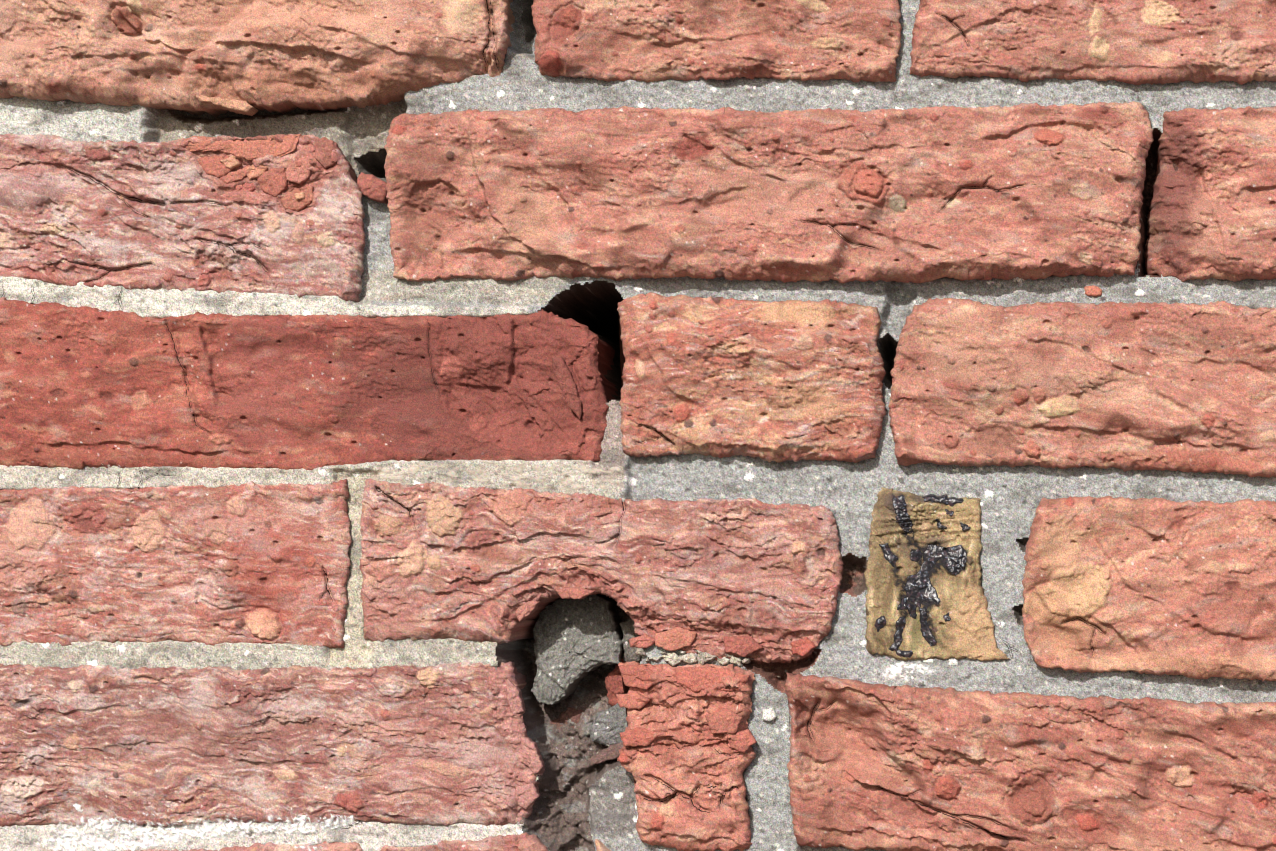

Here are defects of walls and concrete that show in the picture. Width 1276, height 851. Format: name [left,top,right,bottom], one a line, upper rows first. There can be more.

crack [164,319,207,431]
spalling [429,309,609,462]
spalling [483,568,831,851]